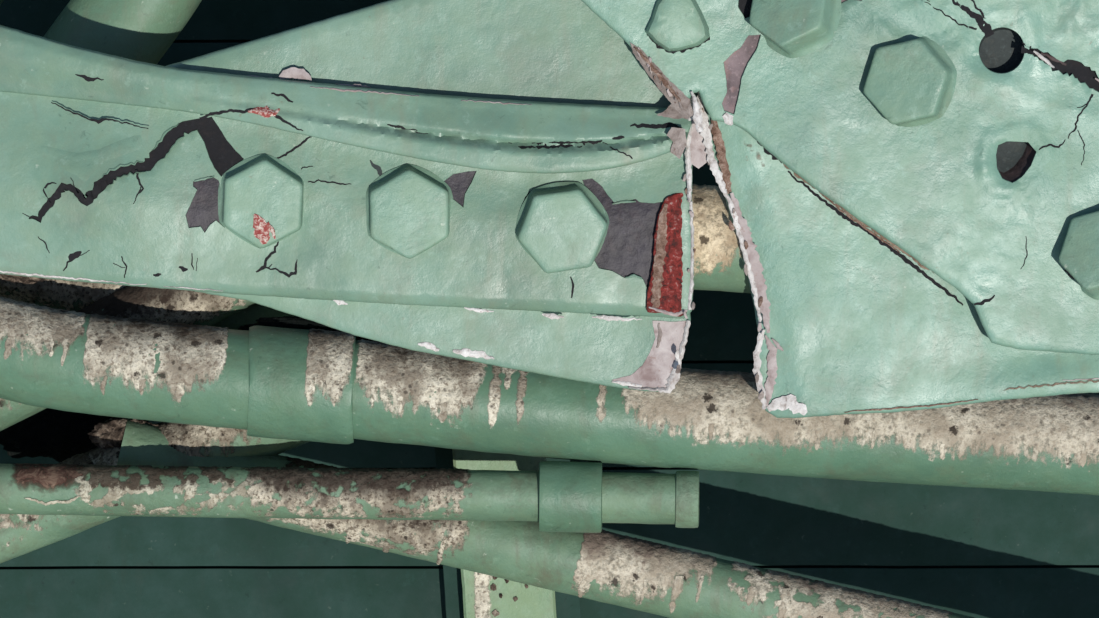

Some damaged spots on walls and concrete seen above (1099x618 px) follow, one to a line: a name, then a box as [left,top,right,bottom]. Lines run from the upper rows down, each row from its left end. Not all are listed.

crack [925,0,994,38]
crack [22,92,350,271]
crack [256,241,297,277]
peeling [583,179,663,289]
rust [646,193,687,317]
peeling [630,35,760,276]
crack [757,141,995,306]
crack [1021,43,1099,165]
peeling [0,271,245,403]
peeling [592,302,1099,467]
rust [12,463,86,505]
peeling [572,529,717,613]